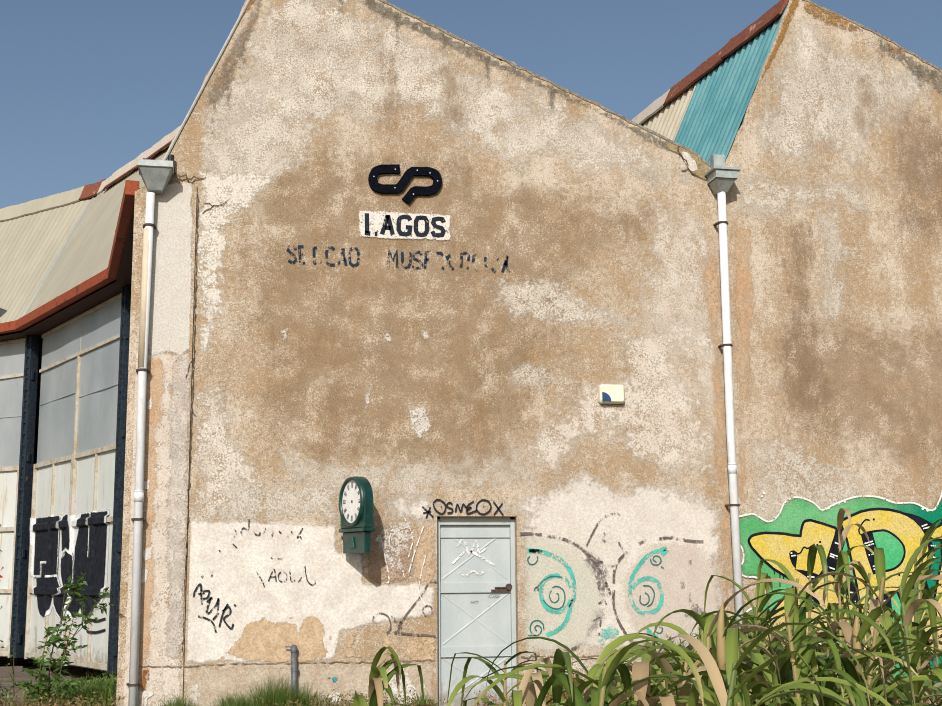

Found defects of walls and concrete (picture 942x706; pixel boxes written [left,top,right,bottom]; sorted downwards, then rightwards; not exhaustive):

damp [365,0,669,150]
damp [880,39,942,92]
damp [900,116,942,224]
peeling [409,407,432,438]
damp [786,288,942,461]
peeling [138,355,191,706]
peeling [367,525,435,587]
peeling [187,617,435,706]